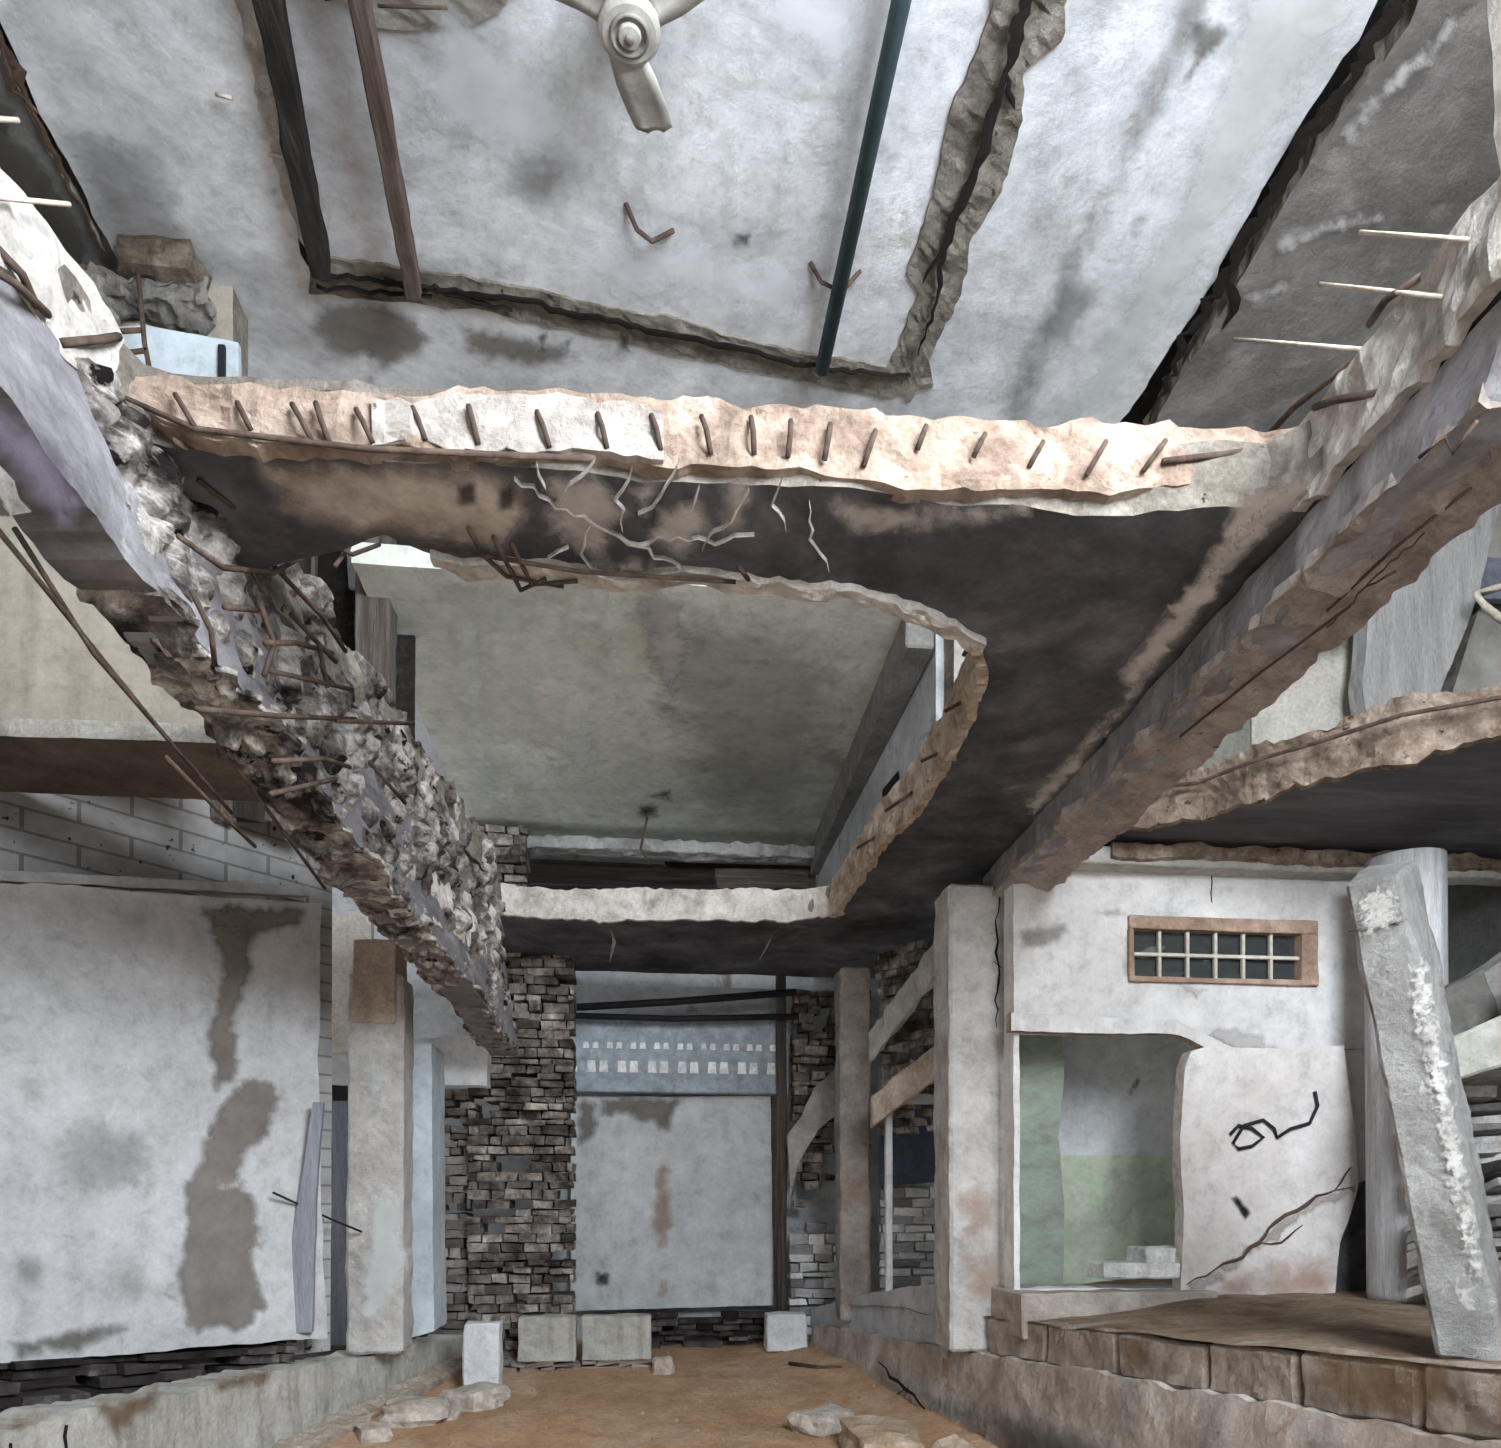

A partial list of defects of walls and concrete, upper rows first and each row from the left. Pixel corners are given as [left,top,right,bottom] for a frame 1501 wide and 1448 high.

spalling [372,0,508,31]
spalling [0,116,21,124]
crack [316,0,1033,377]
water stain [318,304,427,364]
water stain [467,330,565,362]
spalling [0,168,1501,1051]
water stain [178,905,303,1330]
spalling [1408,959,1483,1311]
crack [1186,1167,1354,1285]